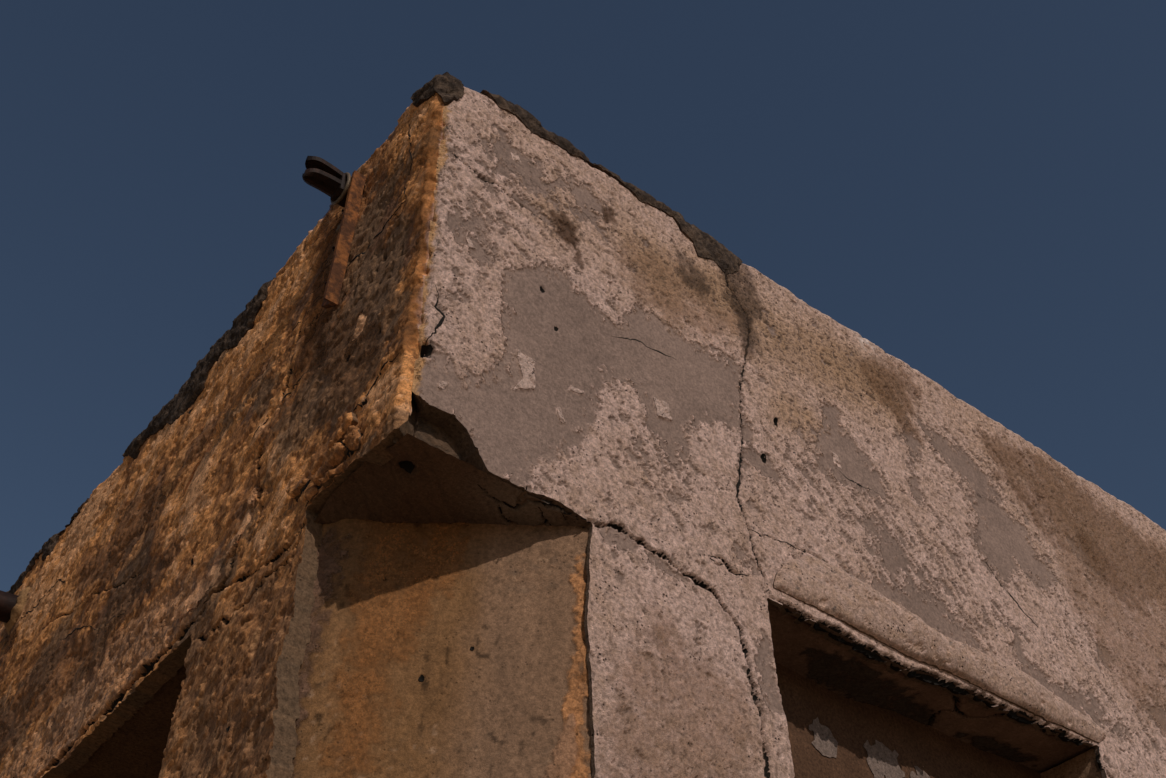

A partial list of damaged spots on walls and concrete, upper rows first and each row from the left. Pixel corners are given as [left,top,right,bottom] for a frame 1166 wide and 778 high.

crack [346,124,413,268]
crack [353,285,445,411]
peeling [408,212,782,492]
spalling [286,412,363,507]
crack [478,275,1111,778]
peeling [857,574,988,653]
peeling [755,628,785,714]
peeling [809,717,838,758]
peeling [1011,626,1131,738]